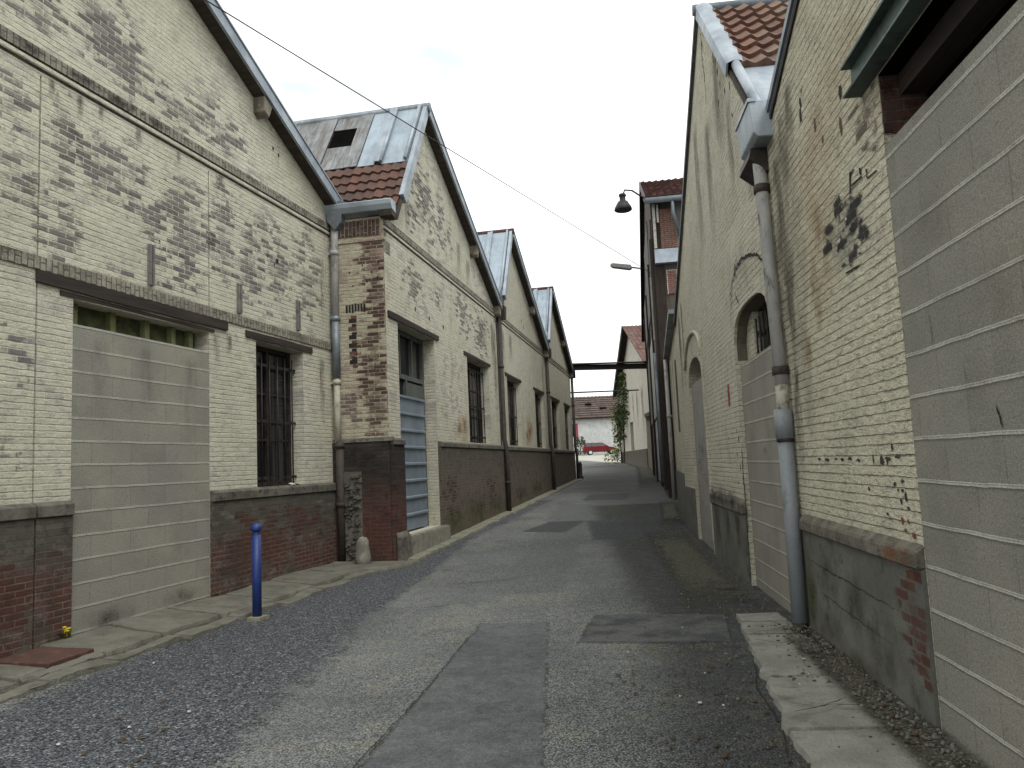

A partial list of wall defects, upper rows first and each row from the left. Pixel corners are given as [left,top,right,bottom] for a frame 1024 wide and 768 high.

spalling [823,187,868,274]
crack [811,560,894,646]
spalling [896,564,932,692]